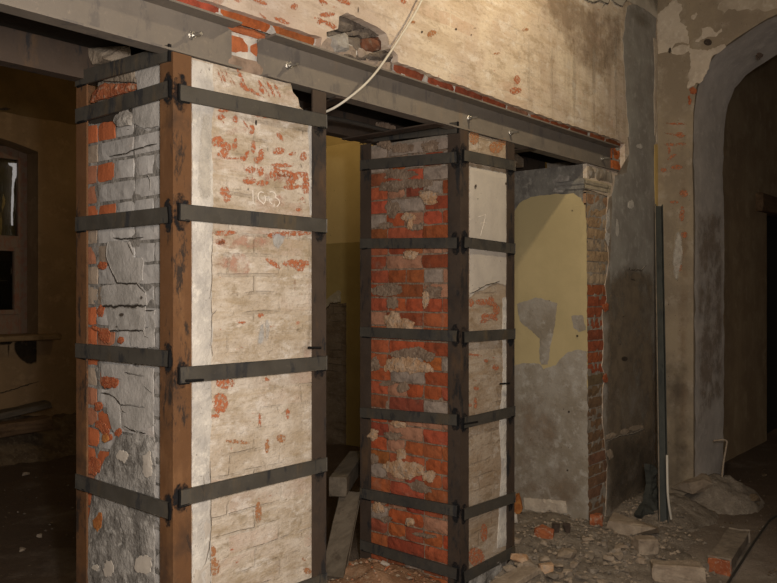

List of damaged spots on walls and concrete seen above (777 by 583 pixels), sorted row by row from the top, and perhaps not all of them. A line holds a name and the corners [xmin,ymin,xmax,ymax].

spalling [89,100,160,129]
spalling [90,65,160,103]
flaking render [177,0,621,170]
crack [585,0,626,8]
peeling [653,0,726,206]
peeling [515,190,644,520]